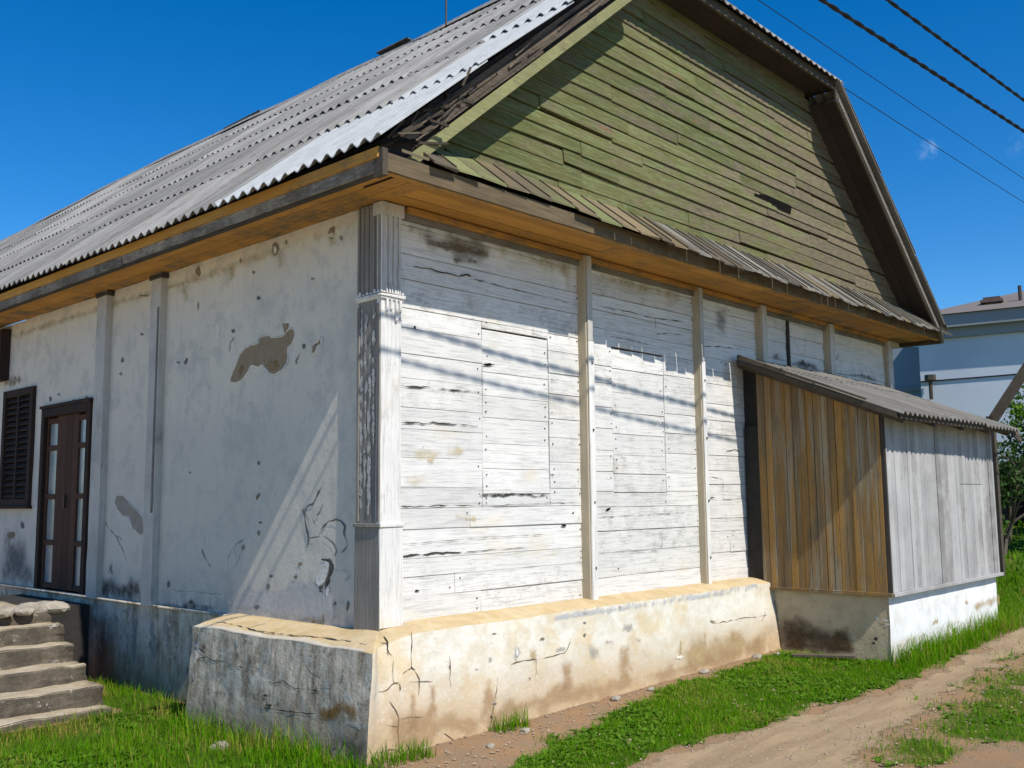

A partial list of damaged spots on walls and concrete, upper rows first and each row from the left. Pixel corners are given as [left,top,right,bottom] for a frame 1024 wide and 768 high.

leakage [426,235,487,263]
peeling [230,323,324,385]
peeling [115,494,144,536]
crack [302,482,347,556]
leakage [778,621,853,654]
crack [223,622,451,753]
crack [490,643,570,718]